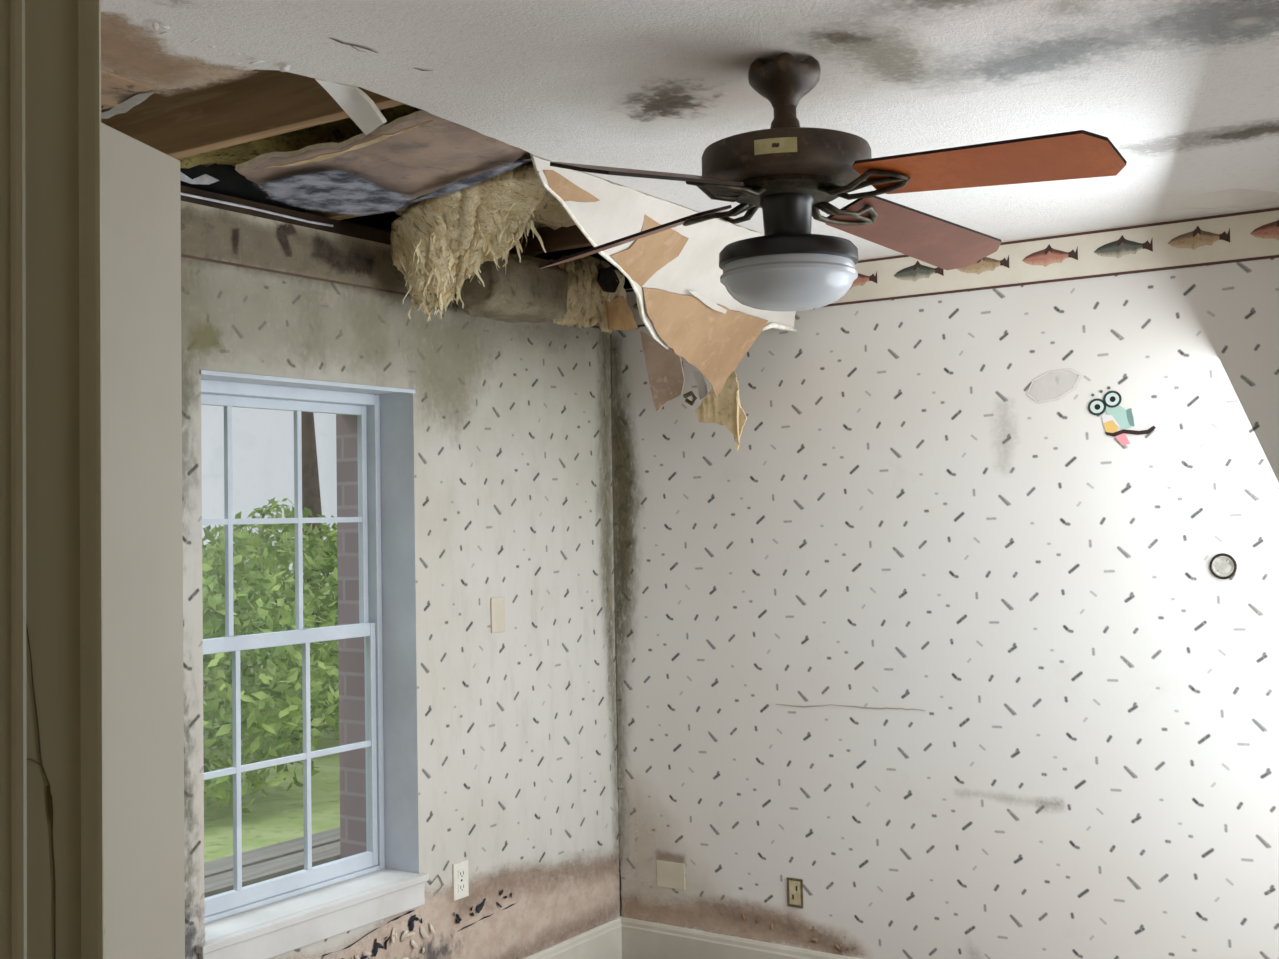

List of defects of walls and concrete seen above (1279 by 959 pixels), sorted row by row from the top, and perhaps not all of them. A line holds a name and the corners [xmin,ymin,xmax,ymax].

peeling [101,13,264,94]
damp [635,89,695,117]
damp [1213,127,1279,139]
damp [257,160,526,216]
damp [181,211,408,293]
damp [602,334,632,792]
peeling [453,890,512,924]
peeling [342,915,435,959]